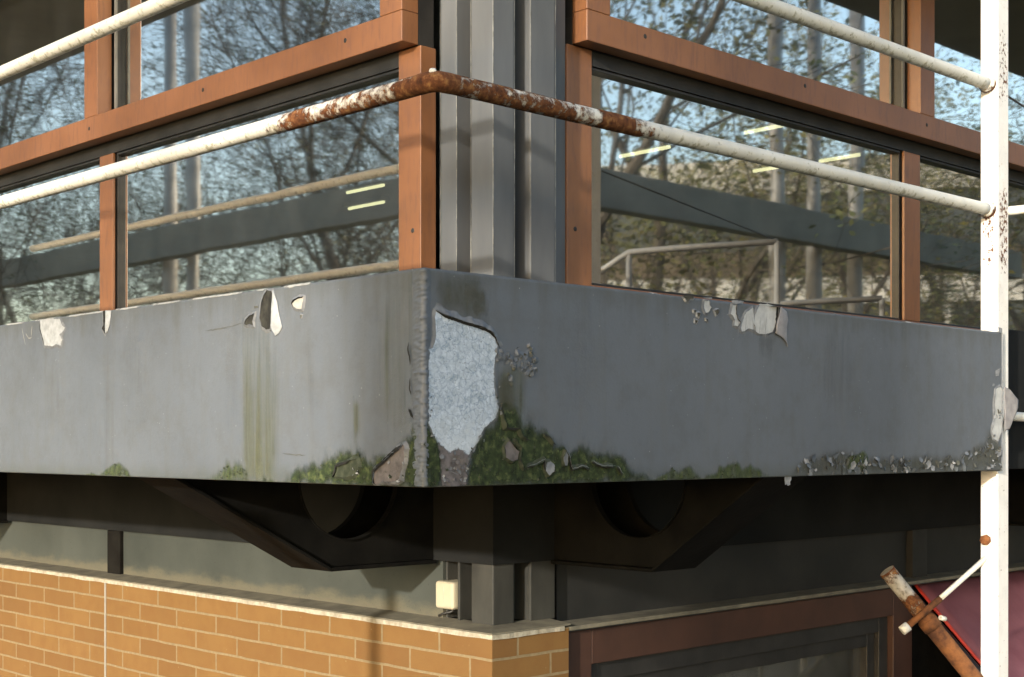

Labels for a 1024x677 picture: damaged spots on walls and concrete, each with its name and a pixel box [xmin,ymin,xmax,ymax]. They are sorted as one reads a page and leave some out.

corrosion [266,71,659,138]
peeling [7,306,139,349]
peeling [153,282,314,336]
peeling [681,295,789,346]
peeling [423,302,503,487]
peeling [785,368,1019,486]
peeling [371,440,410,486]
corrosion [880,565,926,618]